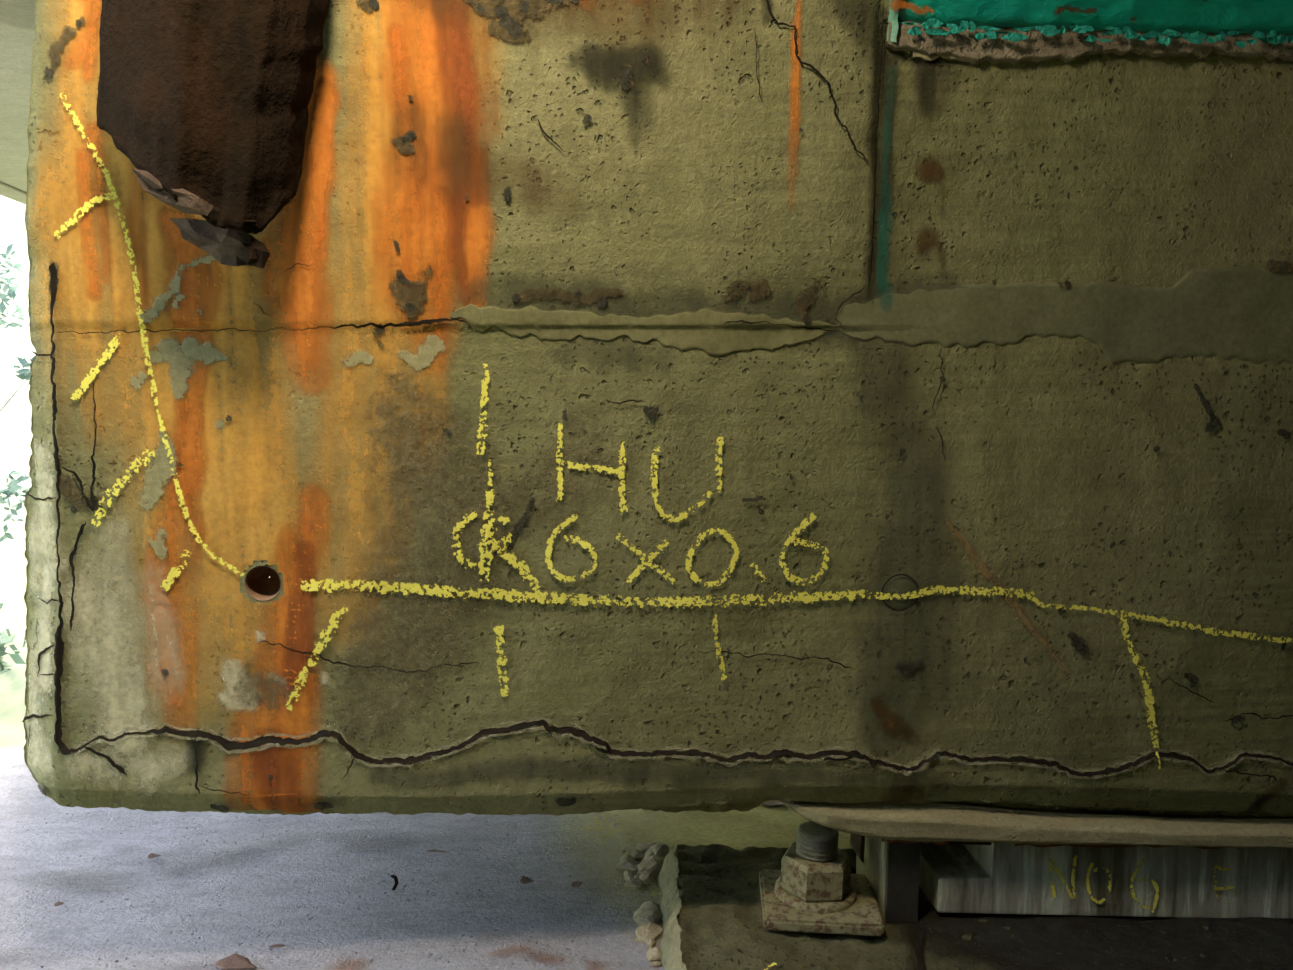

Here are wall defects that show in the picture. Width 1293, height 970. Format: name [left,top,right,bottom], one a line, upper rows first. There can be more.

leakage [571,47,662,122]
rust [791,0,800,138]
leakage [838,0,893,225]
spalling [886,18,1293,65]
rust [326,0,490,583]
rust [37,0,336,813]
crack [22,262,1293,795]